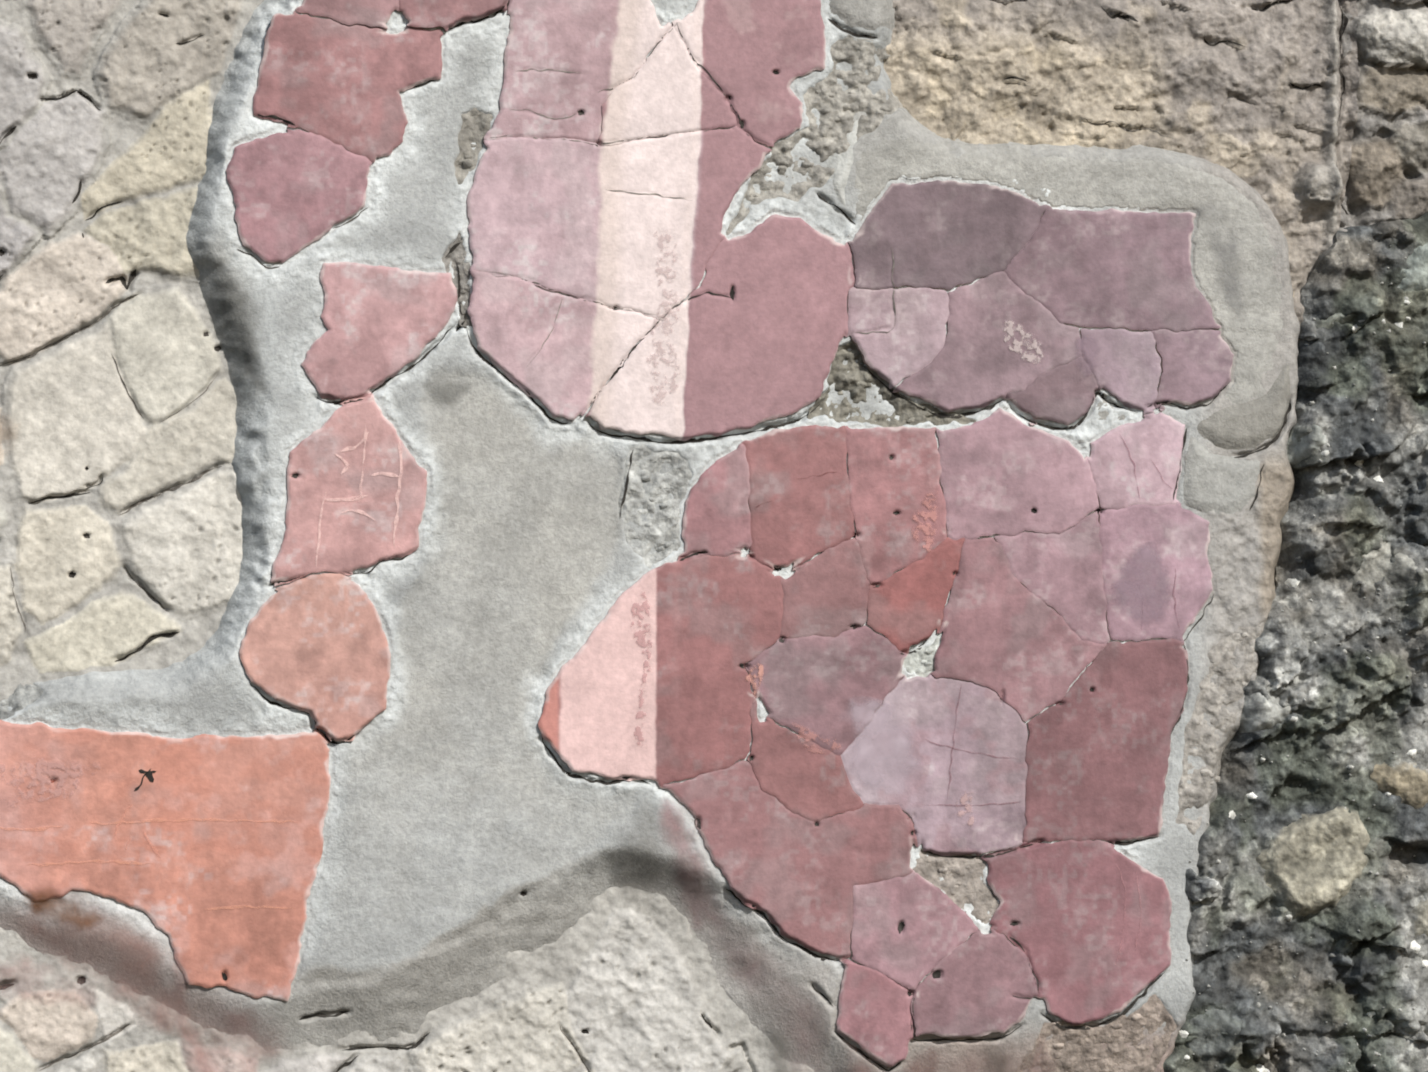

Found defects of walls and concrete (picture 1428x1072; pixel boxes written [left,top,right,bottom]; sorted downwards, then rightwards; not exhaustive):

crack [490,24,760,145]
crack [606,189,692,201]
spalling [726,35,904,235]
crack [1290,4,1348,150]
crack [316,242,820,516]